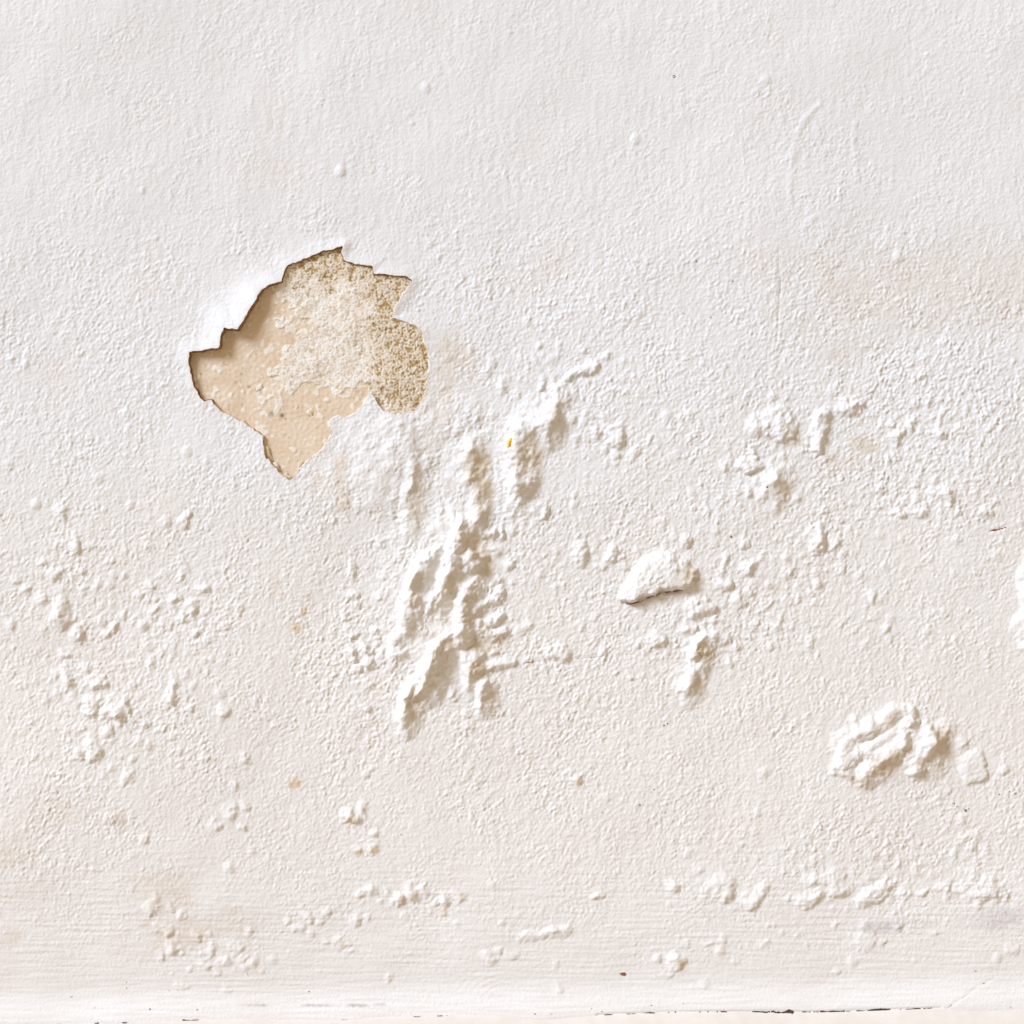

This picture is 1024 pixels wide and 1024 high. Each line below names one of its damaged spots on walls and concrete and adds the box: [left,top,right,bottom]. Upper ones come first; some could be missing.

peeling [173,236,430,480]